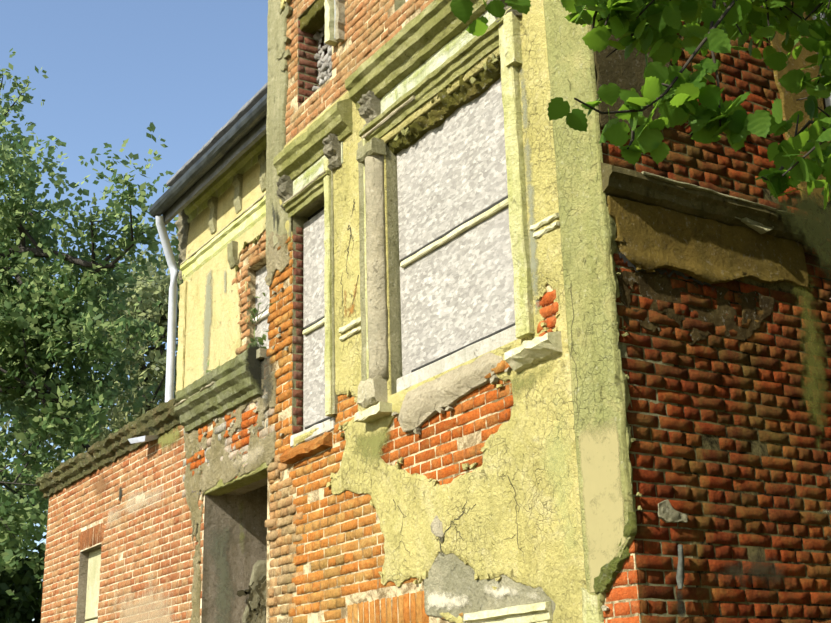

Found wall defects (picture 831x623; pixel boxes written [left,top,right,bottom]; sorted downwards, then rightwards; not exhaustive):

peeling [276,0,434,142]
crack [340,201,359,319]
flaking render [535,290,560,337]
peeling [186,223,429,623]
peeling [380,360,514,487]
peeling [581,195,810,623]
crack [436,500,476,554]
crack [237,575,266,623]